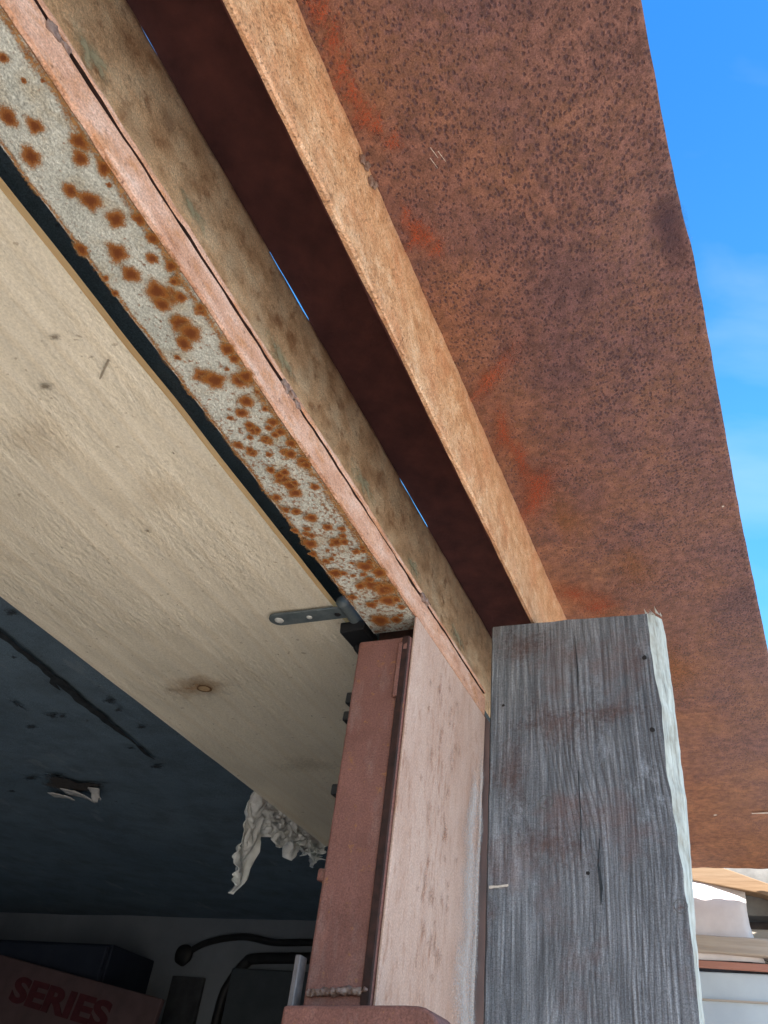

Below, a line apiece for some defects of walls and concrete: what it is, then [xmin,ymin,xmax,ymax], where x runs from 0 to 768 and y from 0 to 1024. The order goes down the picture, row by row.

rust [0,8,407,628]
peeling [44,776,104,803]
crack [578,771,603,902]